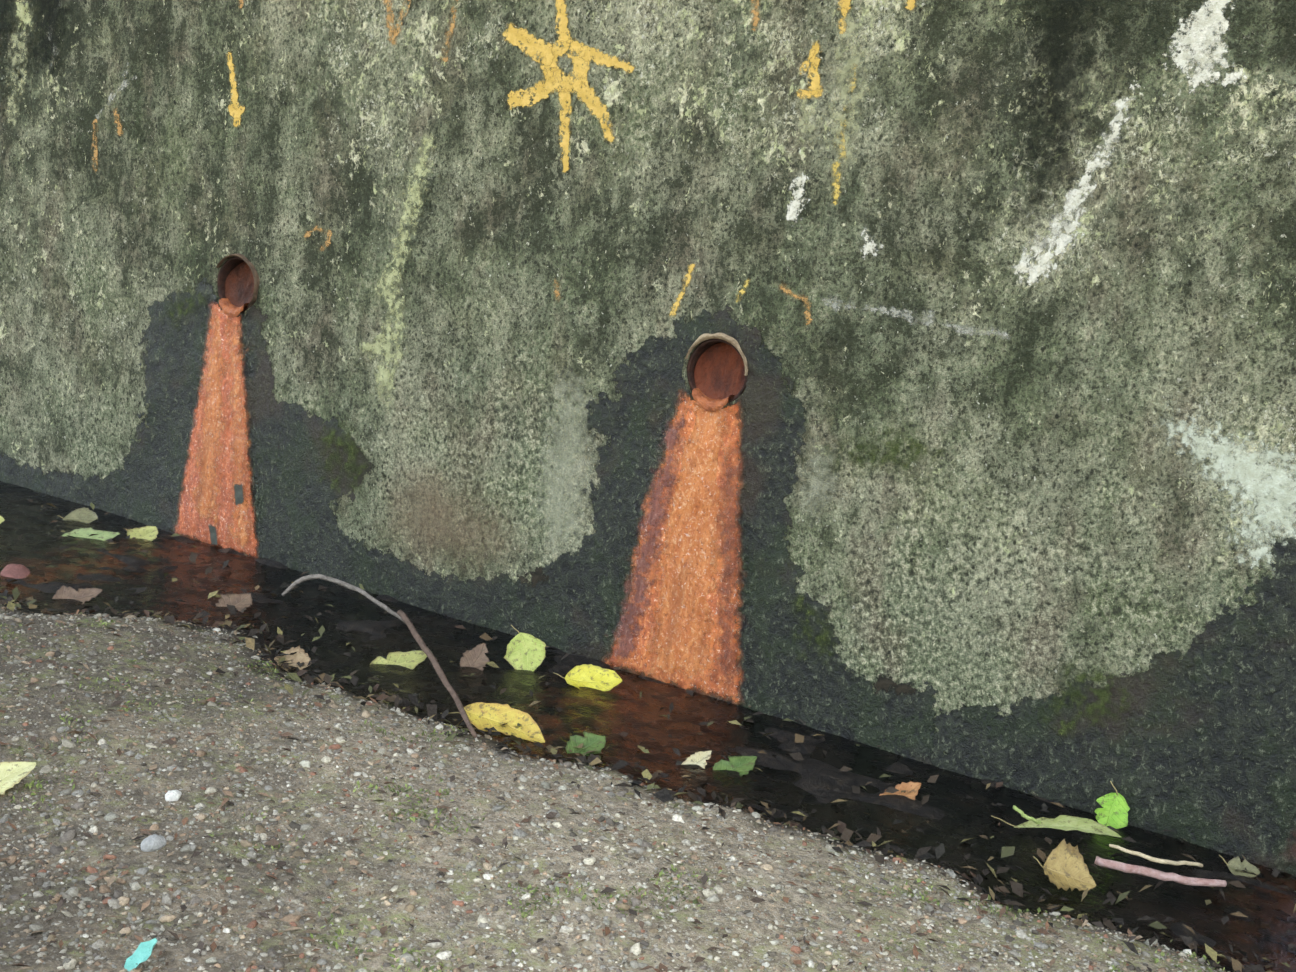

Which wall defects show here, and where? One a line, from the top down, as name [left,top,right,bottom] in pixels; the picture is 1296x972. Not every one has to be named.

damp [0,277,222,547]
rust [175,304,258,557]
rust [605,397,741,702]
damp [237,305,1296,875]